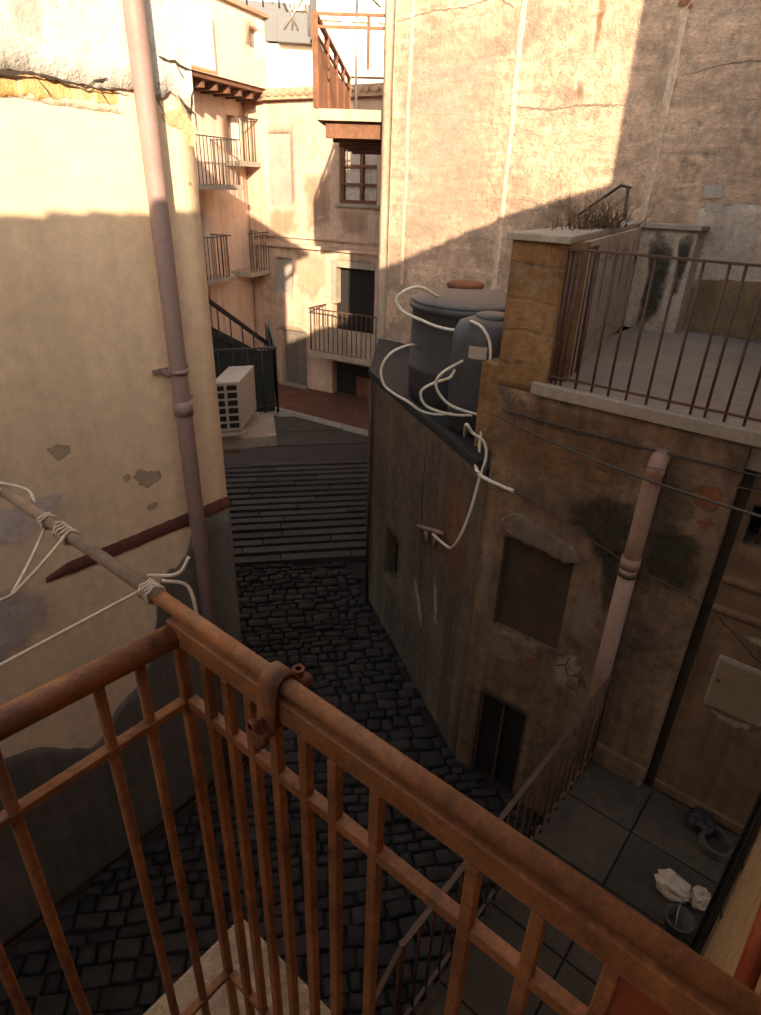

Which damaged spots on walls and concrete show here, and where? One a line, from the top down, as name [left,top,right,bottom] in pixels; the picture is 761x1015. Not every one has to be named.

crack [396,0,514,22]
crack [682,60,761,76]
spalling [0,69,125,117]
crack [517,103,625,111]
water stain [637,233,693,322]
water stain [684,279,761,339]
peeling [47,445,70,460]
peeling [123,470,161,488]
water stain [571,499,633,611]